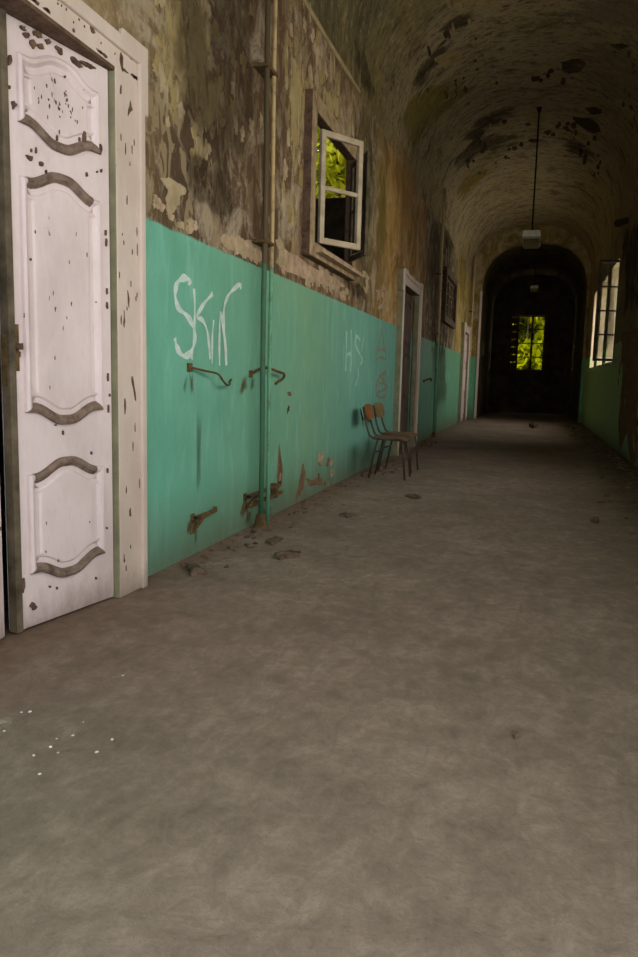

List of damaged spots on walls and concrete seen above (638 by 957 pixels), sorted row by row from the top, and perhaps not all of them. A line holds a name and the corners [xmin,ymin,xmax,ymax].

peeling [19,25,96,69]
peeling [72,18,138,81]
peeling [152,0,215,163]
damp [415,14,472,87]
peeling [18,75,103,207]
peeling [233,112,263,142]
damp [455,108,518,168]
peeling [614,327,638,464]
flaking render [295,452,335,502]